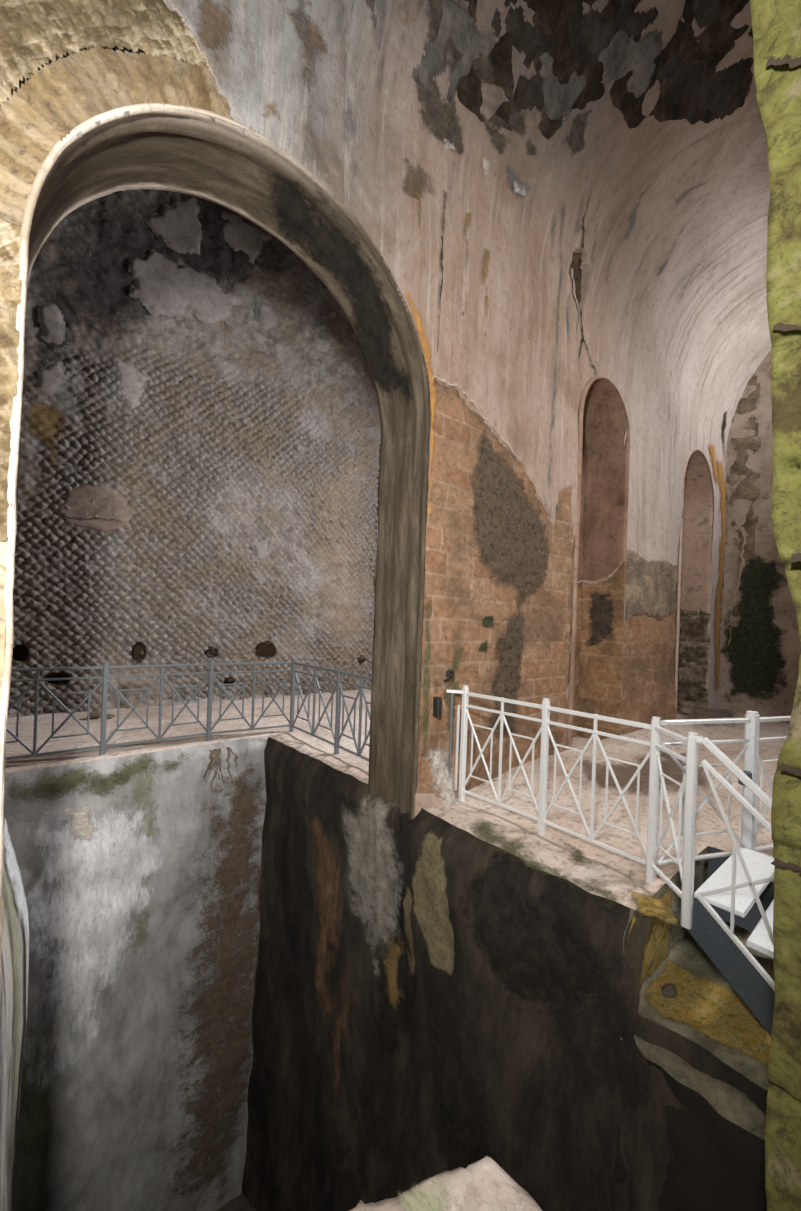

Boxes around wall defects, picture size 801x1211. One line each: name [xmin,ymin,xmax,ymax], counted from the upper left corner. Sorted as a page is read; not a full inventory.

spalling [0,0,233,700]
peeling [411,0,754,155]
crack [582,195,591,248]
crack [579,309,597,379]
damp [0,772,165,1211]
damp [174,769,267,1200]